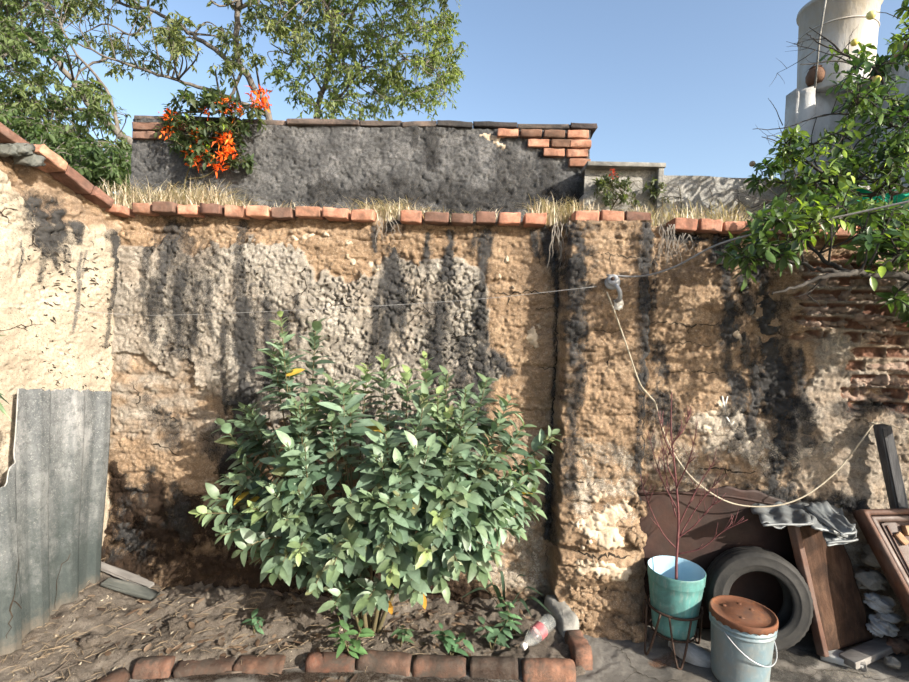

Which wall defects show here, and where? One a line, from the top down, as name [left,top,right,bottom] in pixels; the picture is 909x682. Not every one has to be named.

crack [18,225,43,273]
leakage [20,191,87,332]
flaking render [81,199,158,247]
flaking render [185,219,486,360]
leakage [358,220,411,371]
leakage [423,232,432,281]
leakage [304,138,584,216]
spalling [479,128,592,168]
spalling [796,277,909,403]
leakage [101,216,327,595]
leakage [425,221,834,604]
flaking render [568,490,632,584]